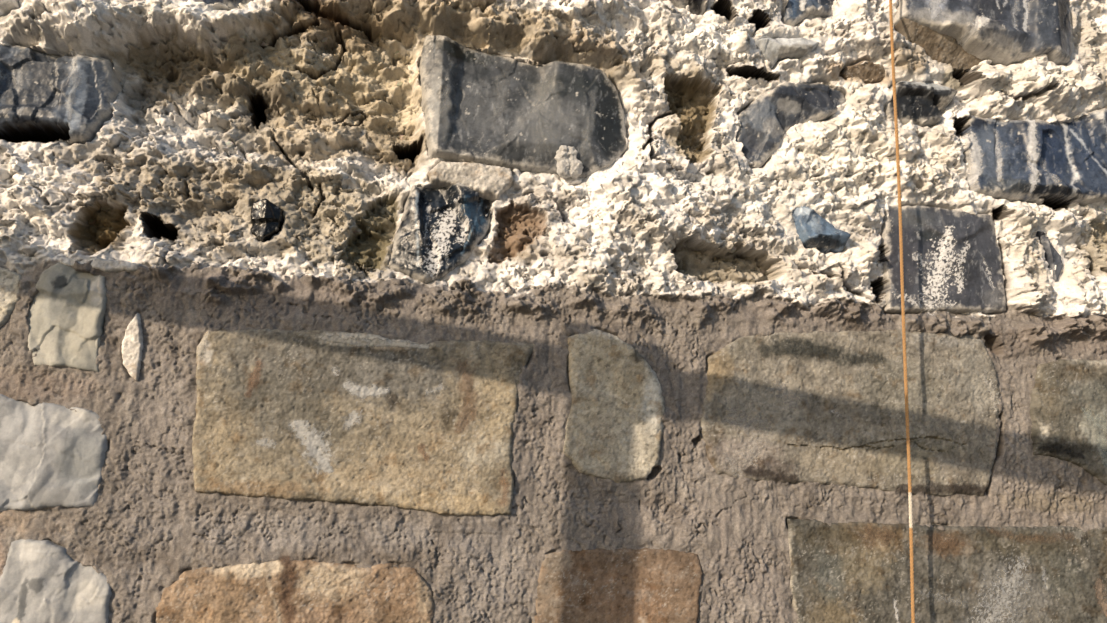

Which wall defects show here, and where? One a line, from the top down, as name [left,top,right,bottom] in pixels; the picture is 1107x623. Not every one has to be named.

crack [256,0,373,80]
crack [787,436,967,453]